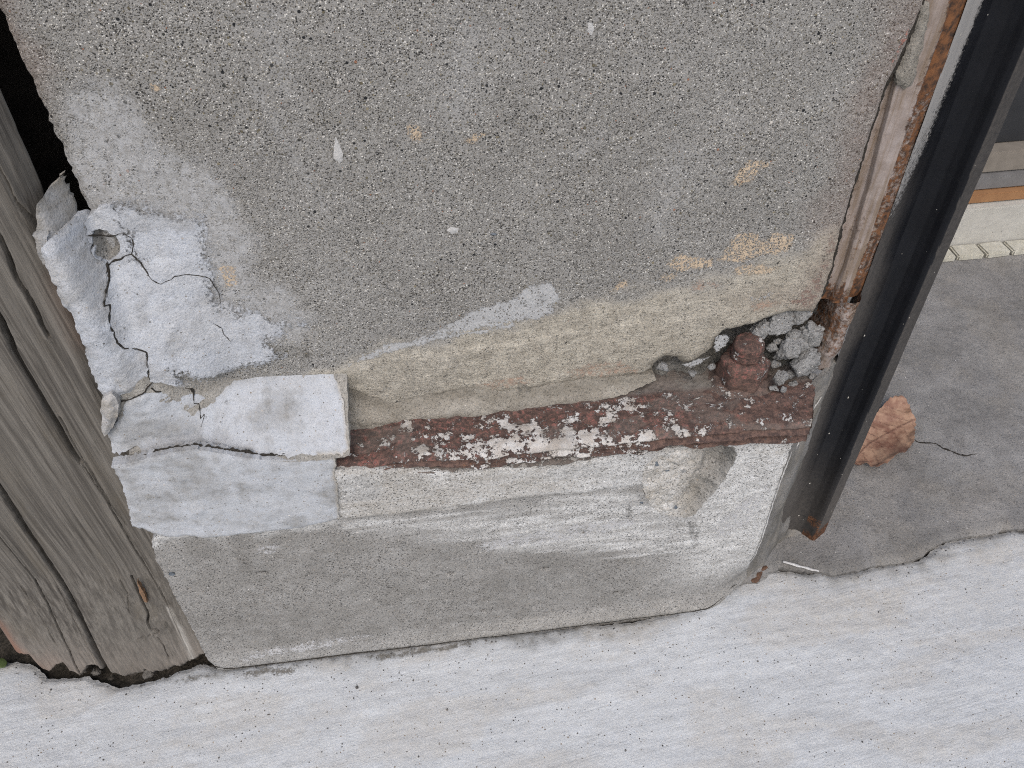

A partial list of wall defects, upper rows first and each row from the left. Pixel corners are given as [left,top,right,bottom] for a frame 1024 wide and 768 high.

spalling [93,229,120,260]
crack [87,233,284,456]
spalling [652,318,764,376]
spalling [763,303,818,367]
peeling [100,390,122,436]